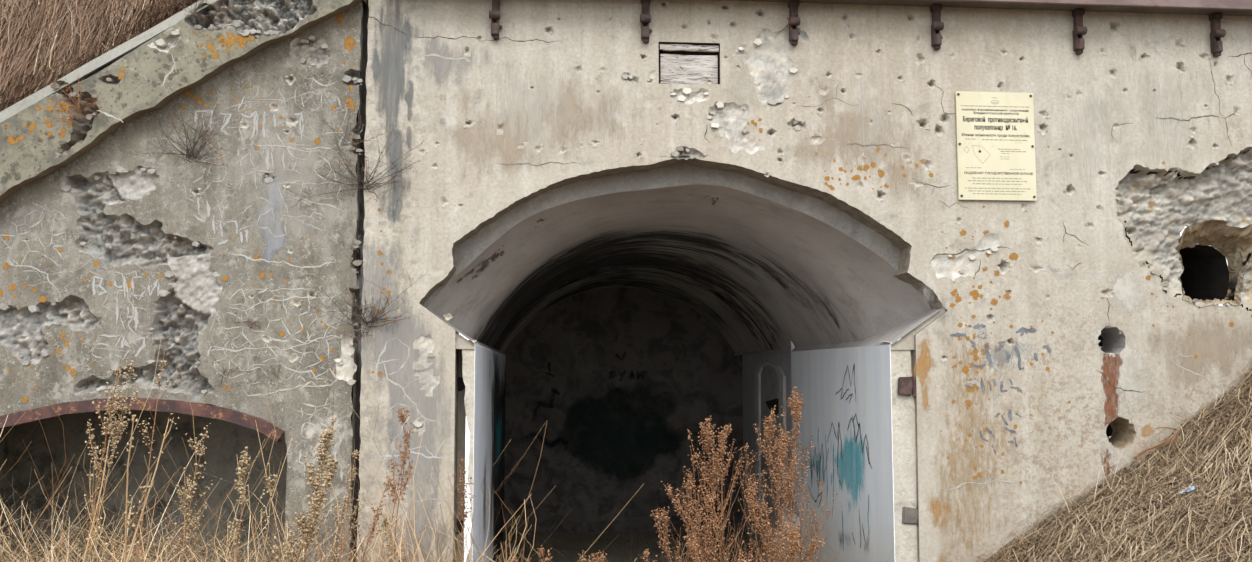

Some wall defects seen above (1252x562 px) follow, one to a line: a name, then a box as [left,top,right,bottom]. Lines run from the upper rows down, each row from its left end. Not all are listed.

spalling [148,0,331,86]
spalling [342,69,364,86]
spalling [621,53,657,84]
spalling [655,3,864,177]
crack [1111,53,1252,145]
spalling [1174,37,1235,85]
spalling [1085,142,1252,305]
spalling [61,166,223,399]
spalling [931,232,1013,296]
spalling [1216,262,1252,313]
spalling [0,294,102,365]
corrosion [1101,353,1122,426]